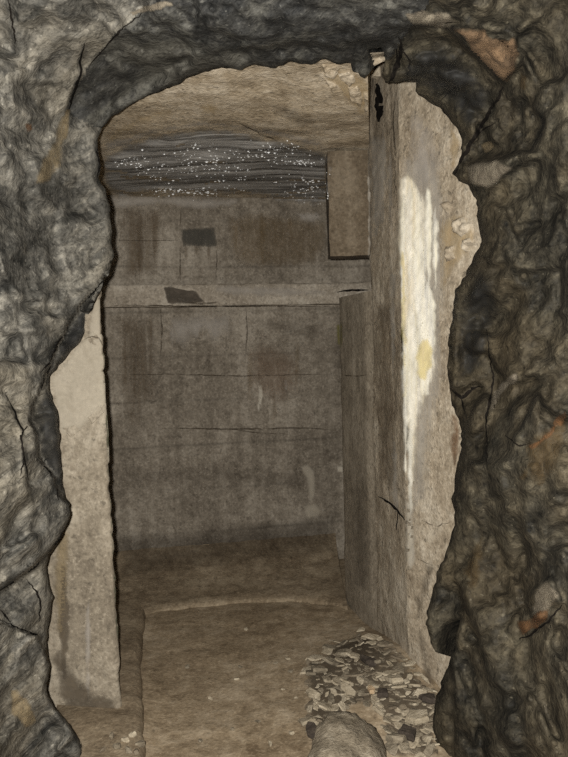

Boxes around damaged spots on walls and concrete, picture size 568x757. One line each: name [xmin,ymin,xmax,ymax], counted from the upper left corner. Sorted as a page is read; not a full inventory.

leakage [105,131,330,207]
leakage [392,149,477,507]
crack [378,496,405,530]